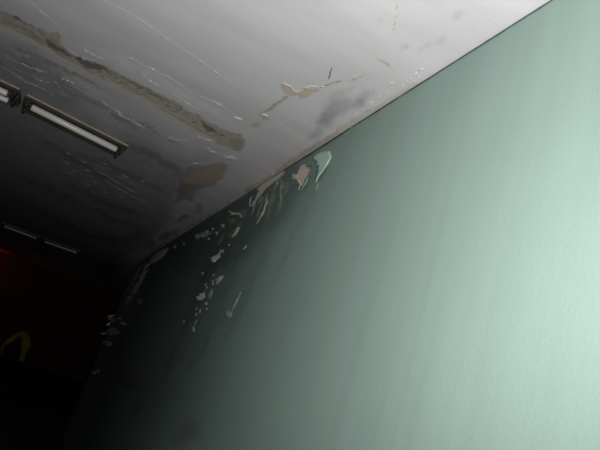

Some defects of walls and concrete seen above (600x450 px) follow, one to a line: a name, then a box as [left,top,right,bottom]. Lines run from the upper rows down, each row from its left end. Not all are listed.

spalling [0,11,245,151]
spalling [194,68,423,262]
peeling [192,274,224,332]